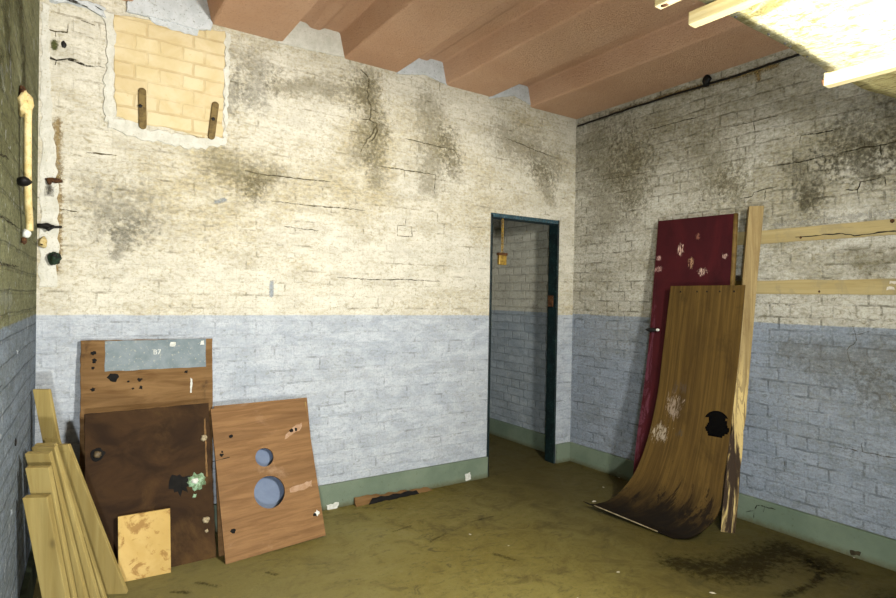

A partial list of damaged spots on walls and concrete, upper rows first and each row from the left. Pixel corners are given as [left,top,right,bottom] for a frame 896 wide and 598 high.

peeling [102,10,231,150]
crack [741,128,896,200]
water stain [660,543,848,597]